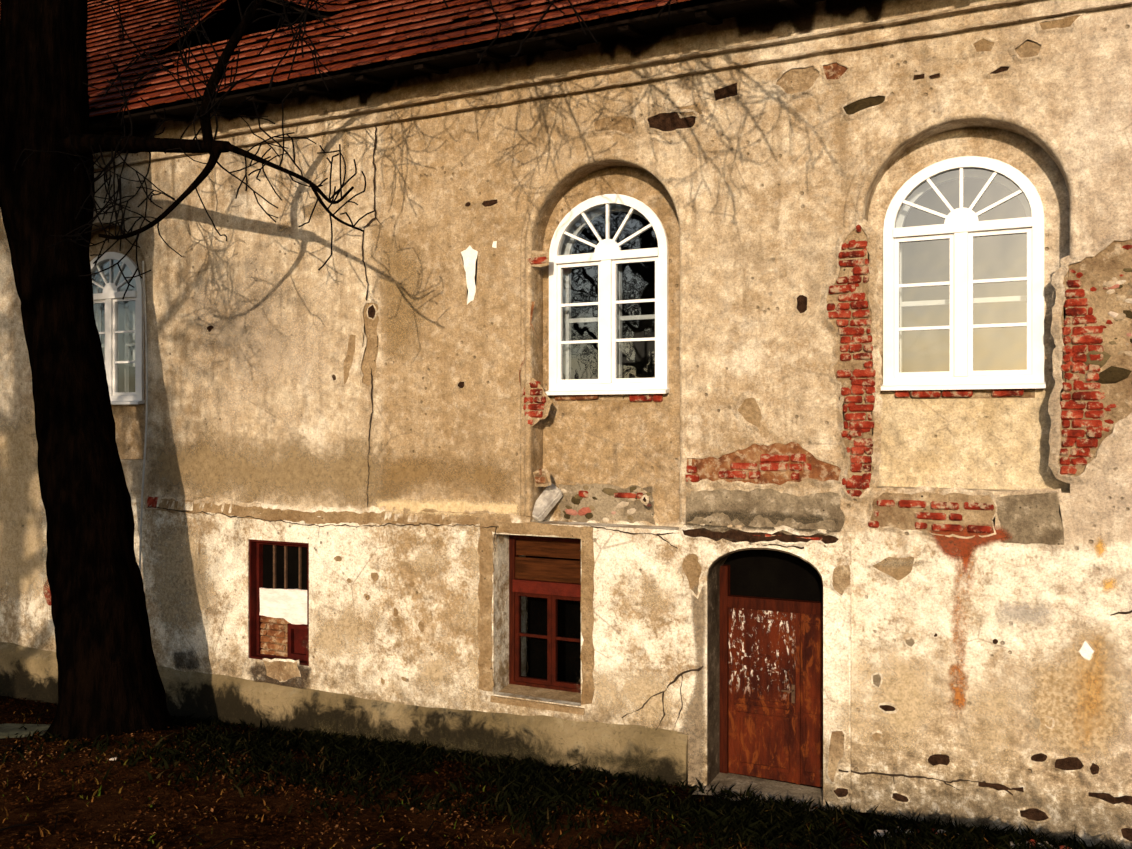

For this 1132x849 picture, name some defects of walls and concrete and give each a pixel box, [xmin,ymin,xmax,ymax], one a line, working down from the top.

flaking render [969,12,1087,79]
flaking render [590,79,744,139]
flaking render [771,58,854,100]
flaking render [839,91,891,121]
crack [361,127,381,301]
flaking render [1048,229,1132,485]
flaking render [522,378,552,427]
flaking render [677,220,998,599]
flaking render [533,468,660,526]
rust [932,526,1010,708]
crack [621,666,704,730]